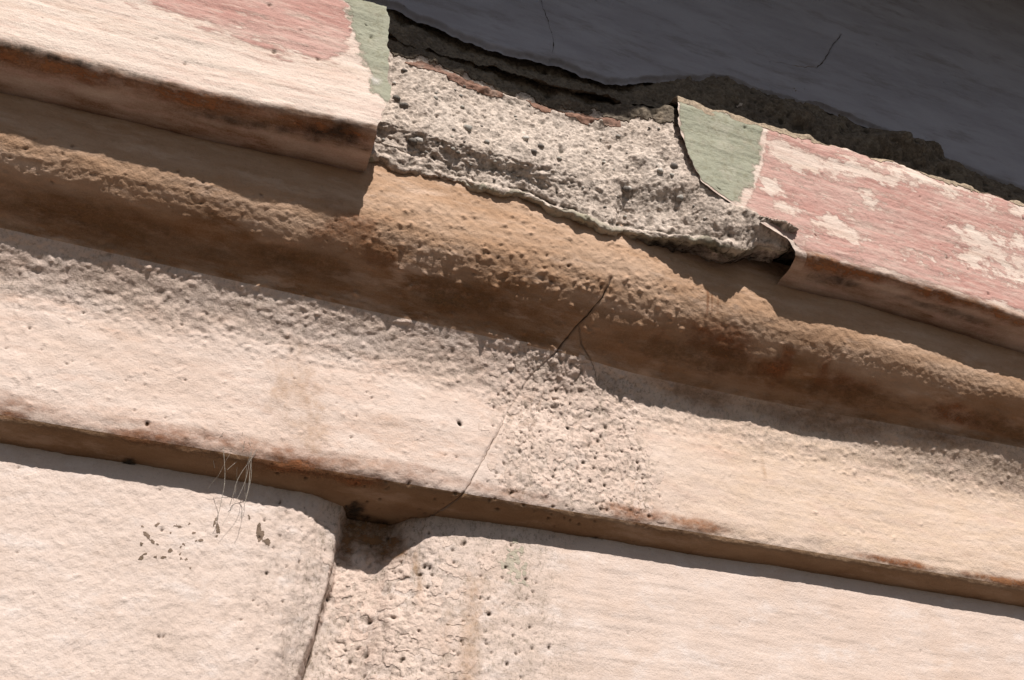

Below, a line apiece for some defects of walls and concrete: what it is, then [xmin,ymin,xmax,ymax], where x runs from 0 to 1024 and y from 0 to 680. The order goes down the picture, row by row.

spalling [150,0,1024,310]
crack [522,281,611,387]
crack [431,424,503,516]